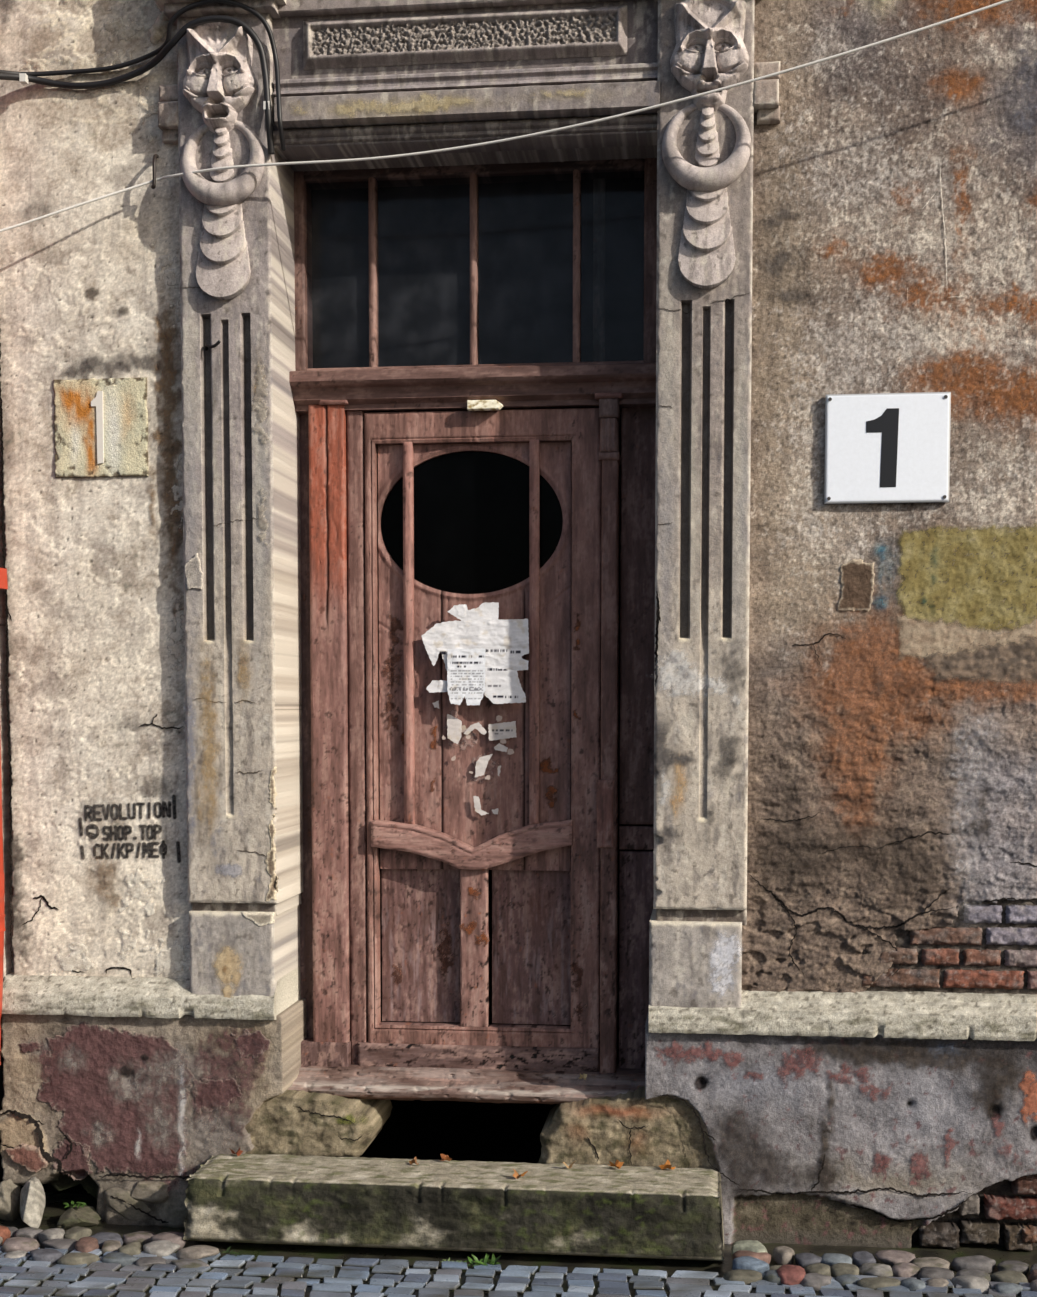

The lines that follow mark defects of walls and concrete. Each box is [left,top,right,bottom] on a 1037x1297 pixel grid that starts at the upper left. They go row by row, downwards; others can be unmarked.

water stain [64,311,183,559]
crack [0,329,59,971]
crack [748,874,1037,976]
spalling [862,898,1037,995]
crack [0,1110,73,1185]
peeling [5,1021,270,1191]
crack [99,1173,190,1223]
crack [587,1119,648,1165]
crack [660,1094,972,1223]
peeling [872,1153,891,1176]
spalling [911,1174,1037,1252]
peeling [988,1105,1019,1159]